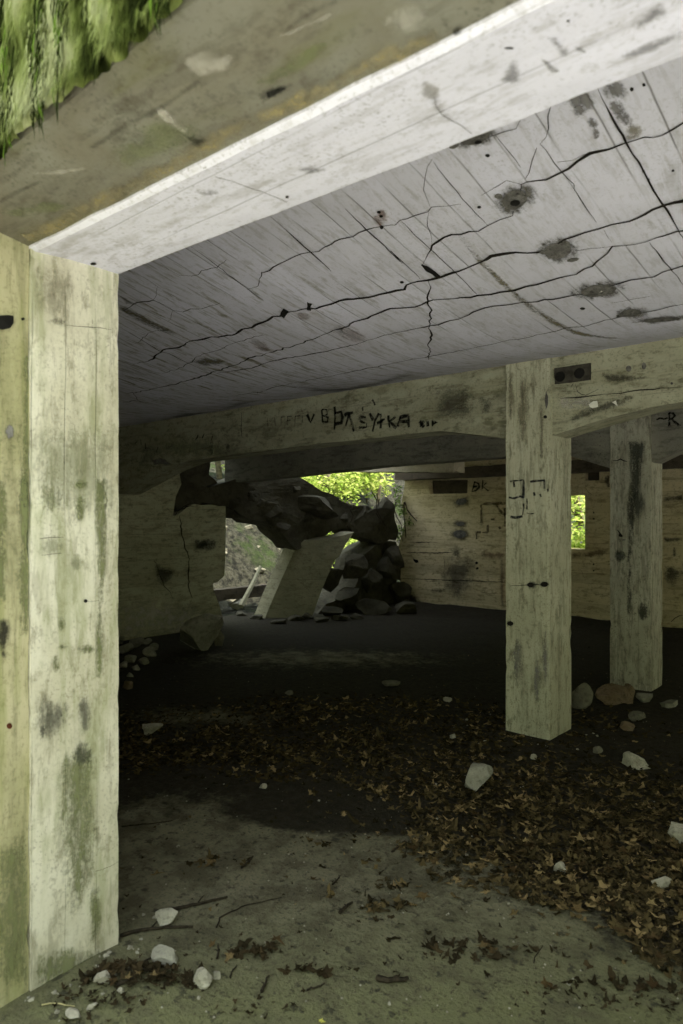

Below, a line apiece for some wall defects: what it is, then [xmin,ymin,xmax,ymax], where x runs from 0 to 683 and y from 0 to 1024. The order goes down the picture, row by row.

water stain [570,93,599,139]
water stain [604,82,640,140]
crack [68,89,683,435]
water stain [476,255,614,339]
water stain [19,478,28,633]
crack [154,506,197,598]
water stain [573,441,648,620]
water stain [41,706,62,735]